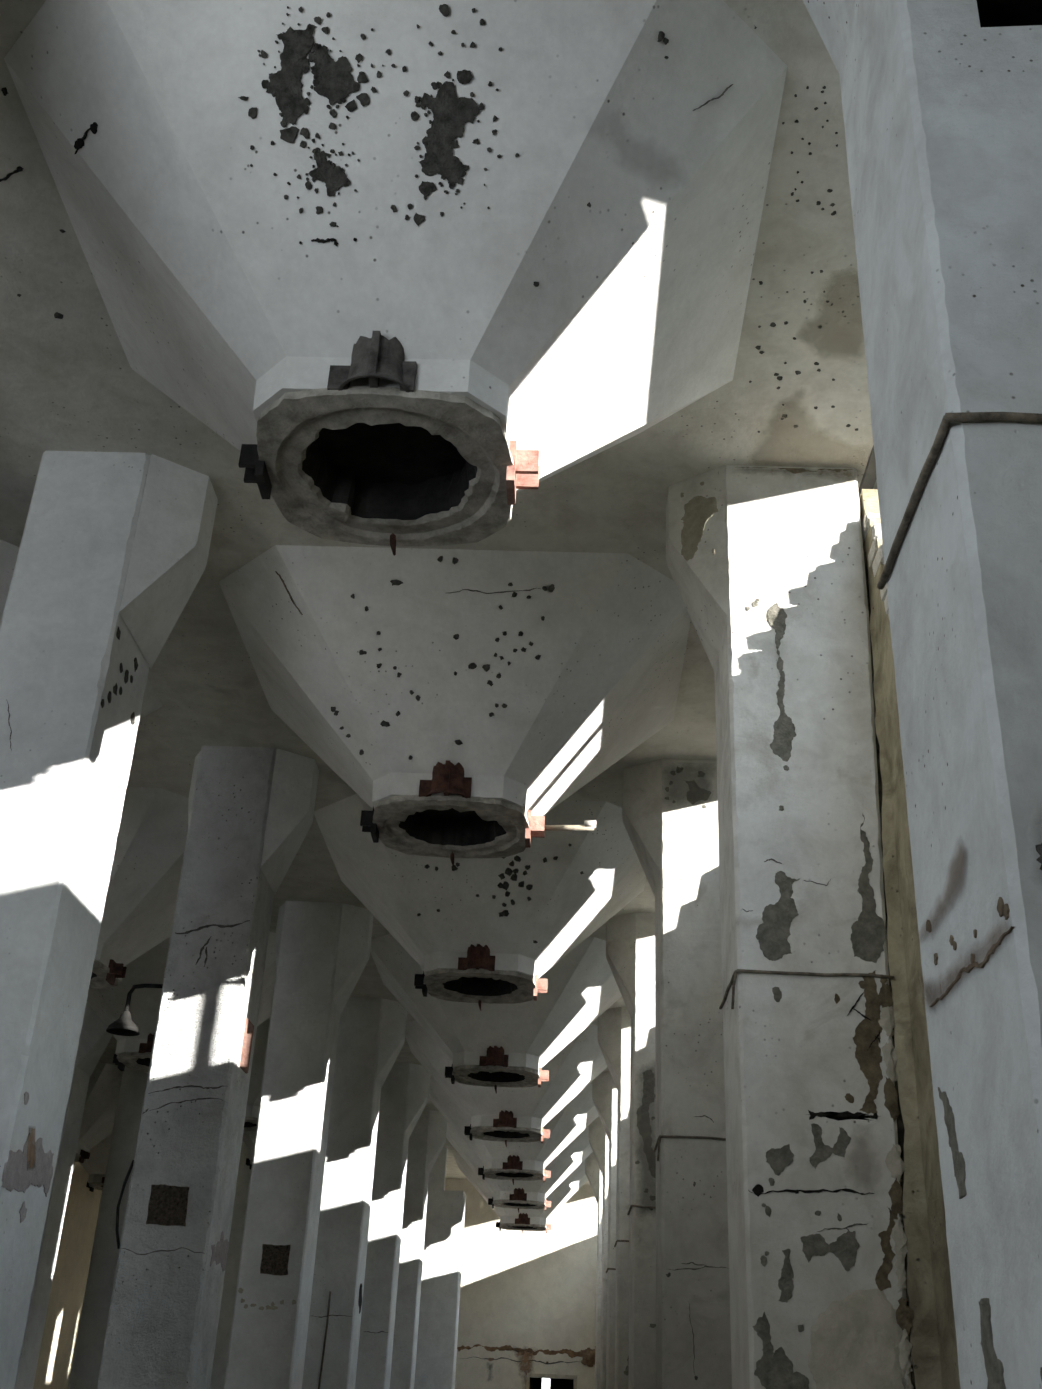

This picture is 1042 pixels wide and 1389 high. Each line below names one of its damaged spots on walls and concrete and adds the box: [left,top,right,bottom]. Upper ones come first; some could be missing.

peeling [238,6,407,227]
peeling [390,41,519,226]
crack [451,584,555,594]
peeling [745,598,796,771]
crack [847,552,895,1051]
peeling [756,871,800,961]
spalling [766,814,900,1186]
crack [926,897,1015,1007]
crack [143,1085,226,1114]
spalling [760,1210,860,1303]
crack [748,1081,916,1389]
peeling [979,1298,1006,1389]